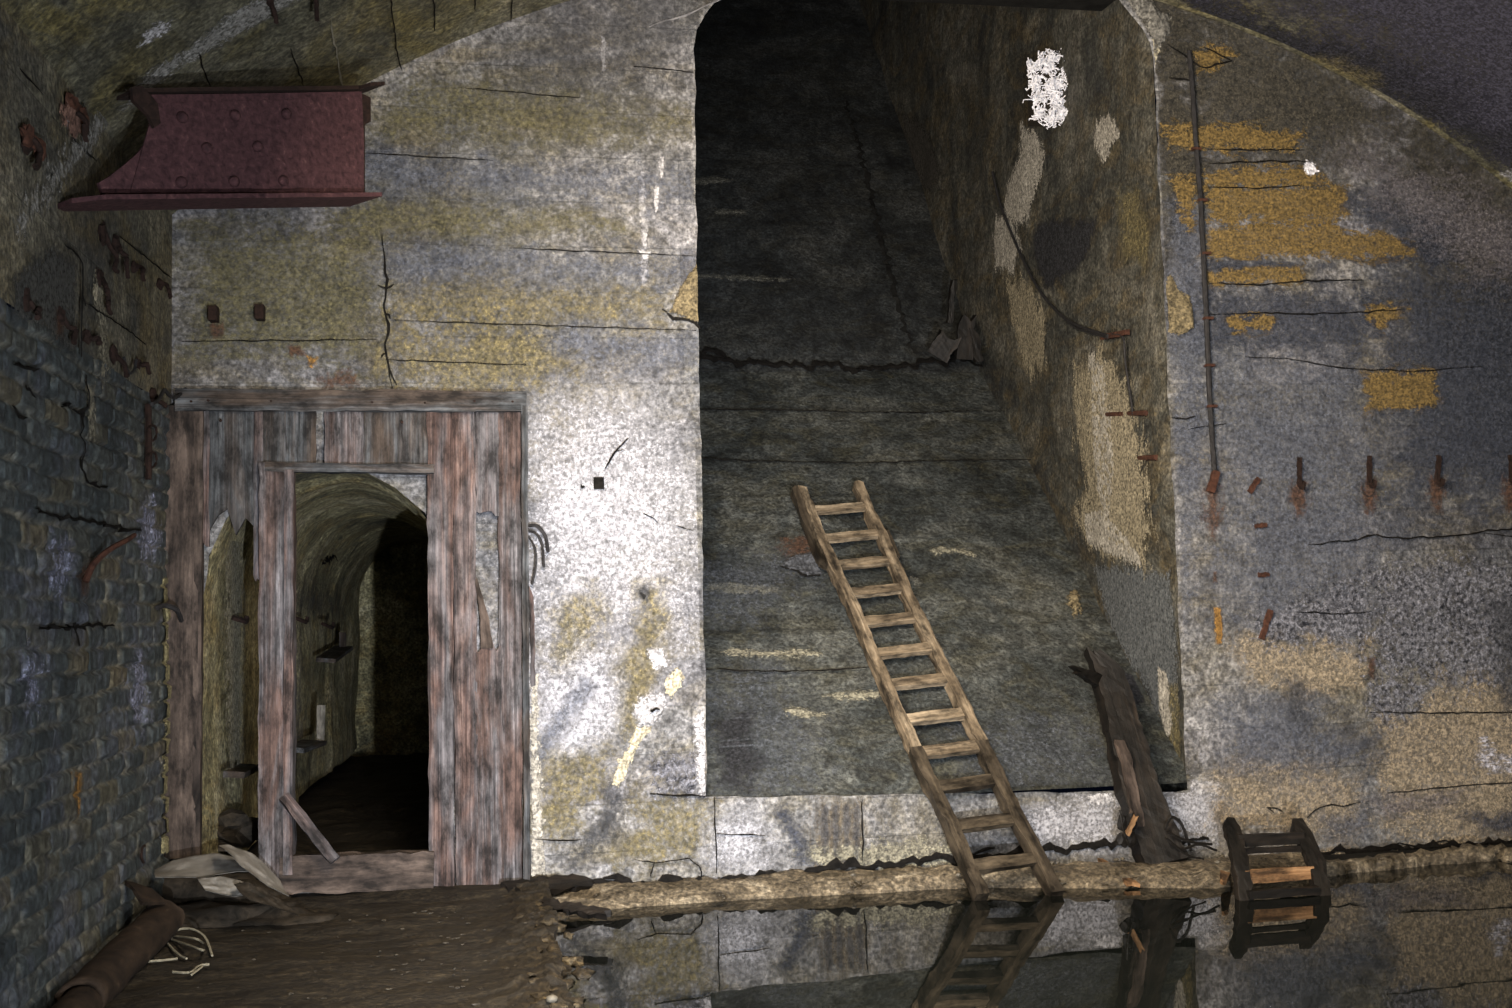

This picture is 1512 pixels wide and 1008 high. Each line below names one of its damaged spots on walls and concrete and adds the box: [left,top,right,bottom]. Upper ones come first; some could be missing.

crack [182,101,983,388]
peeling [1159,117,1420,339]
crack [702,407,986,415]
peeling [1358,363,1446,422]
crack [1309,528,1512,545]